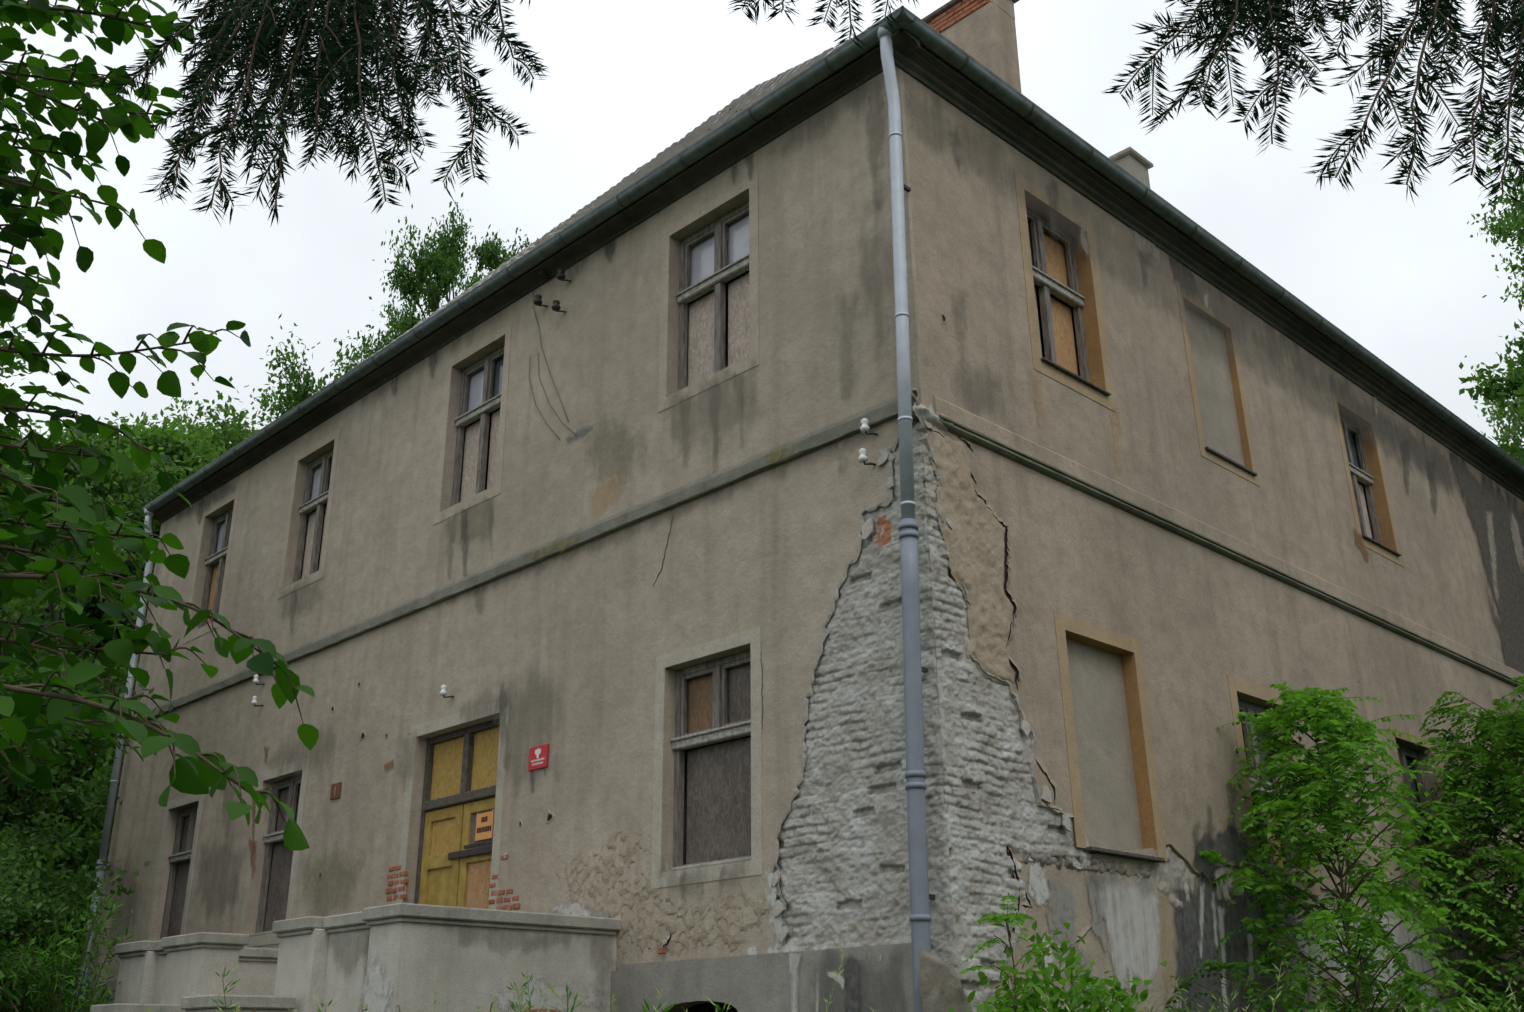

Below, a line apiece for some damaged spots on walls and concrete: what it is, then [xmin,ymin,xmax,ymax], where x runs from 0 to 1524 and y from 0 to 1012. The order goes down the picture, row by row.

crack [653,516,673,585]
crack [930,426,1021,690]
peeling [556,387,1253,1012]
flaking render [385,865,409,901]
flaking render [488,852,520,911]